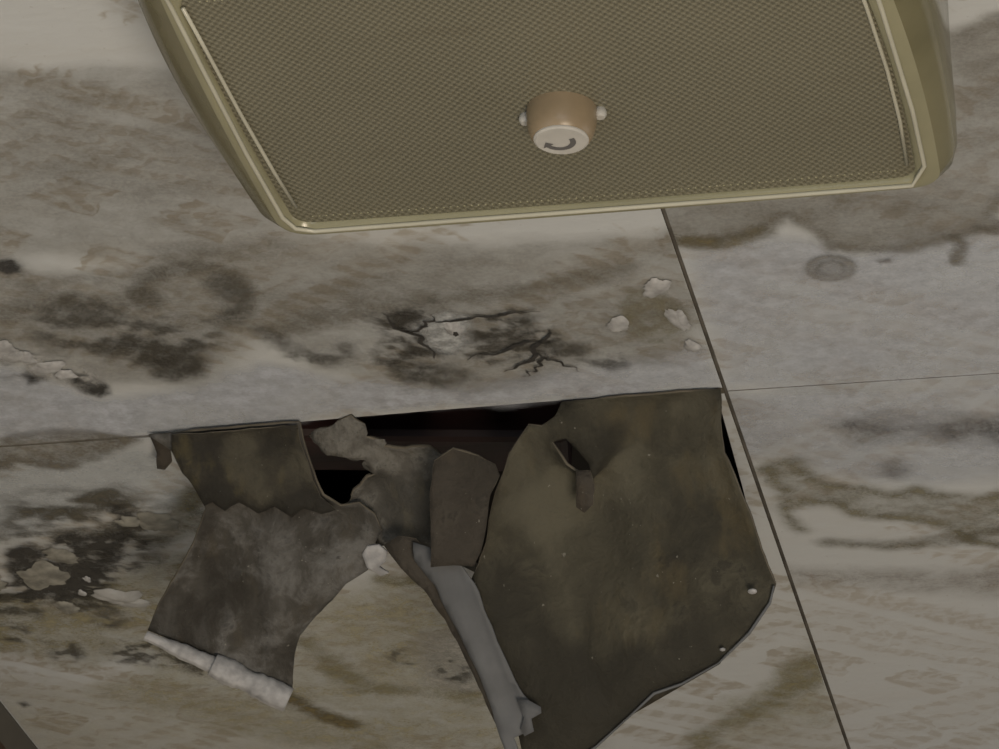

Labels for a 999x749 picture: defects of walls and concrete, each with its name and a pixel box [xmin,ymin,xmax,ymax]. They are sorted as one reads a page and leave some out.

leakage [0,260,19,274]
leakage [671,195,999,334]
leakage [0,268,704,486]
leakage [0,489,202,663]
leakage [759,460,999,547]
leakage [274,597,481,746]